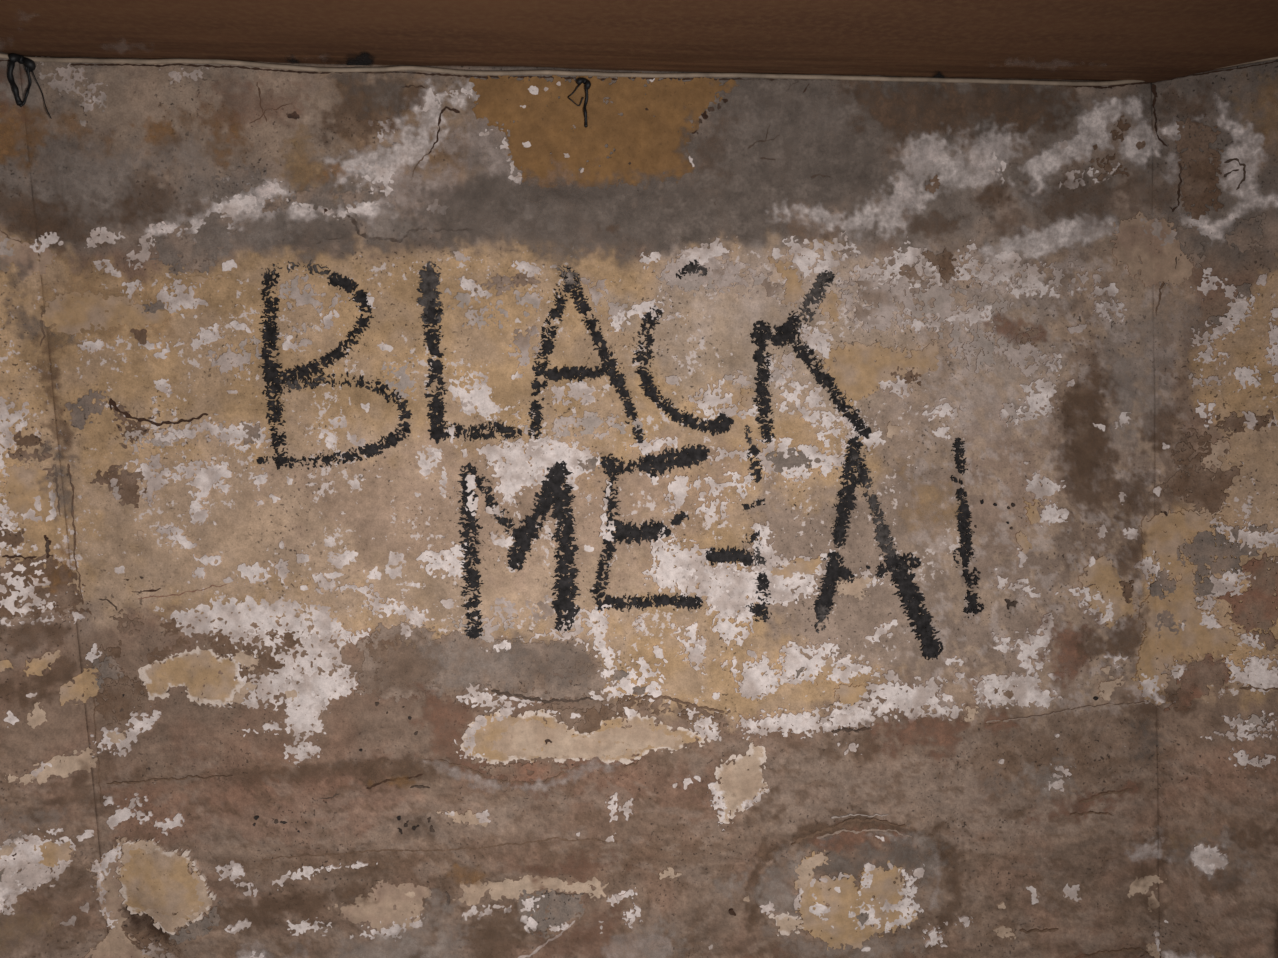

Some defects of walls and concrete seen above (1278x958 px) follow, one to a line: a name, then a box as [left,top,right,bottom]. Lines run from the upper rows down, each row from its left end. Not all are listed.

crack [71,57,863,174]
damp [0,73,1198,265]
peeling [469,72,739,190]
crack [1046,61,1278,212]
damp [1135,101,1278,239]
spalling [0,93,1278,831]
damp [1054,615,1142,679]
damp [1037,763,1076,793]
peeling [0,792,432,958]
spalling [453,875,643,958]
peeling [743,850,973,952]
damp [1186,825,1275,877]